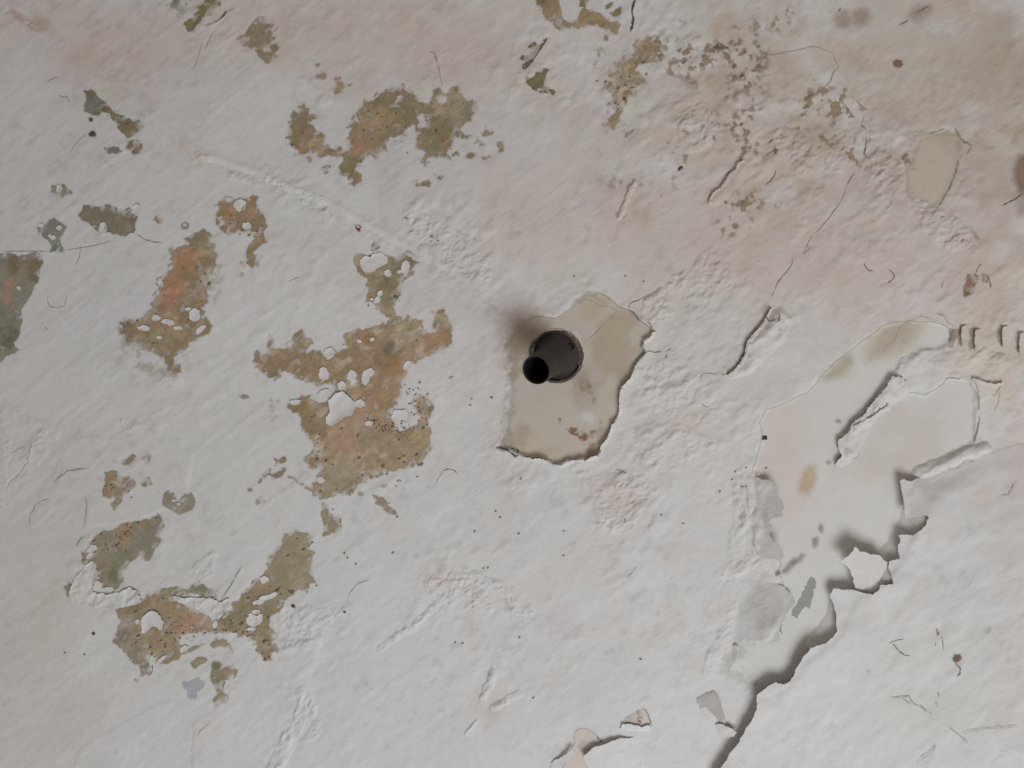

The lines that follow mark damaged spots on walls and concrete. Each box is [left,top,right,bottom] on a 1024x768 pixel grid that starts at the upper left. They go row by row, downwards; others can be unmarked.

peeling [84,90,142,154]
peeling [286,84,504,186]
peeling [520,0,621,95]
peeling [596,36,663,137]
peeling [0,218,66,362]
peeling [78,204,141,240]
peeling [118,195,267,377]
peeling [500,292,656,467]
peeling [65,243,452,703]
peeling [697,320,1024,768]